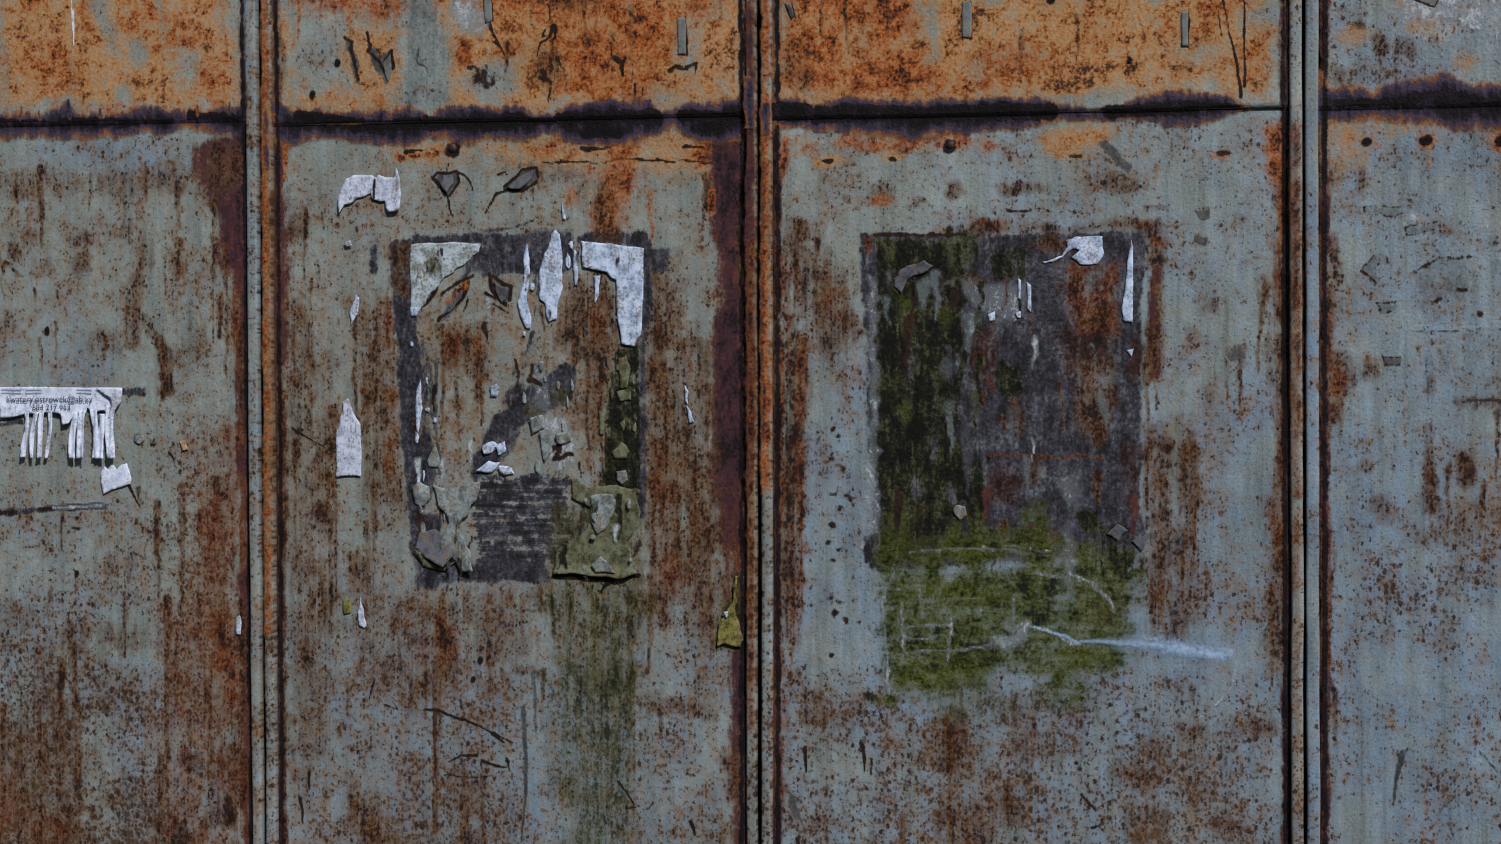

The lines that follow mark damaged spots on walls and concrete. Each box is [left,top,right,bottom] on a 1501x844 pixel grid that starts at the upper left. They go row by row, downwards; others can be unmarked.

corrosion [0,0,265,844]
peeling [424,272,513,322]
corrosion [259,0,1303,844]
corrosion [1318,0,1501,844]